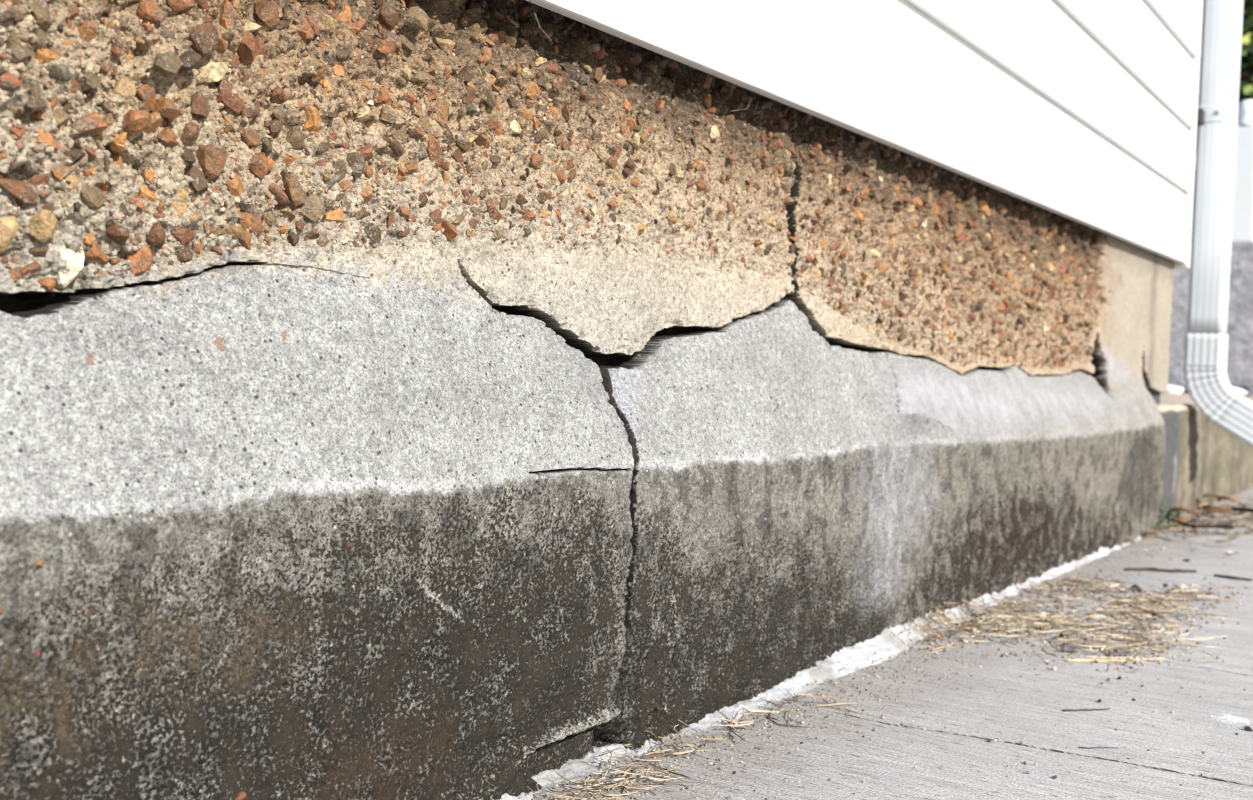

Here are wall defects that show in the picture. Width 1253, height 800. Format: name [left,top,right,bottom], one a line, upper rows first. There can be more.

spalling [0,0,1109,371]
crack [0,261,268,318]
water stain [860,441,937,603]